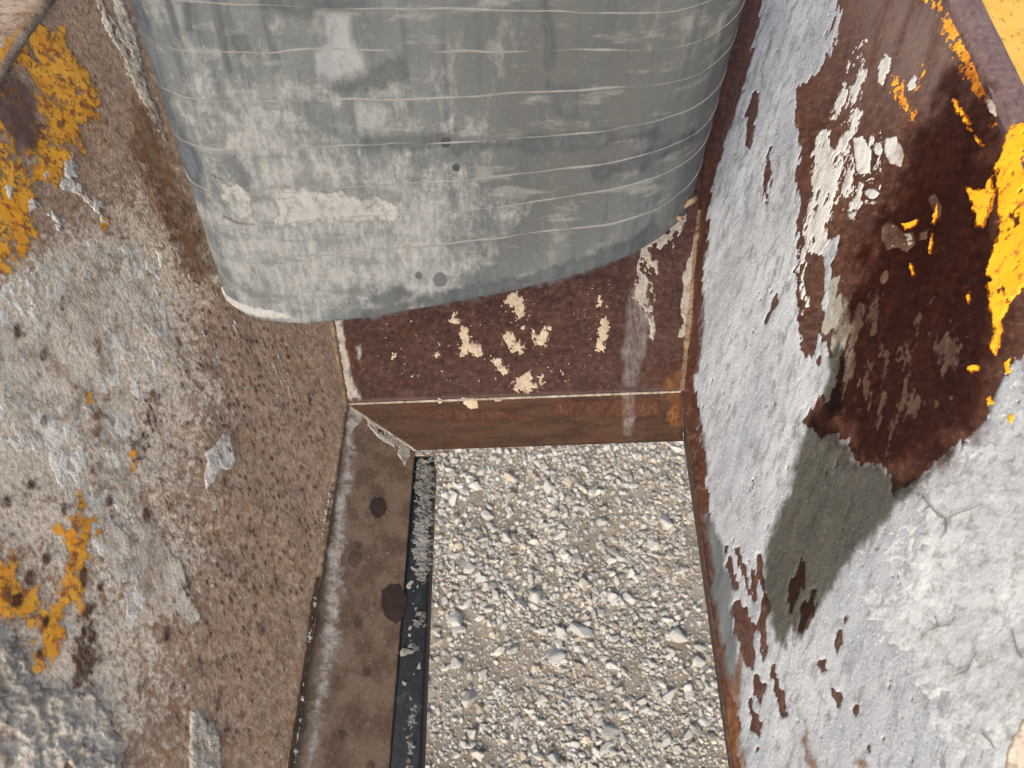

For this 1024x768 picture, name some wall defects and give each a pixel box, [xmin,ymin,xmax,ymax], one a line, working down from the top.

peeling [0,12,109,275]
peeling [797,39,904,359]
rust [889,63,926,121]
peeling [923,0,1024,374]
peeling [0,488,103,681]
rust [346,338,365,378]
leakage [369,497,386,518]
leakage [381,584,408,624]
rust [424,409,541,421]
peeling [448,291,552,394]
rust [554,193,709,476]
spalling [724,545,785,734]